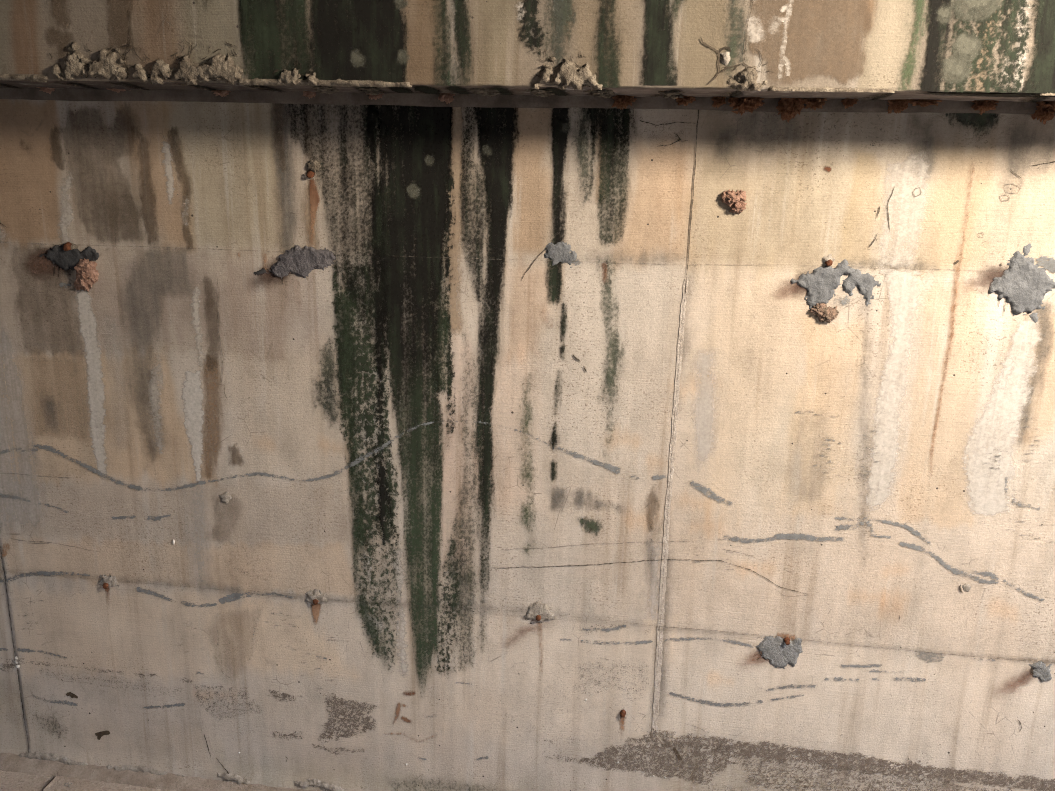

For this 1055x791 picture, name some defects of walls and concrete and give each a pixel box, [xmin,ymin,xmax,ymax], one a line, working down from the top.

leakage [308,0,474,94]
leakage [65,290,107,476]
leakage [51,109,171,304]
leakage [182,282,242,481]
corrosion [305,179,320,247]
leakage [240,0,402,670]
leakage [434,88,519,674]
leakage [546,259,562,304]
leakage [601,261,624,429]
leakage [867,141,931,507]
leakage [964,307,1049,515]
leakage [546,740,1012,791]